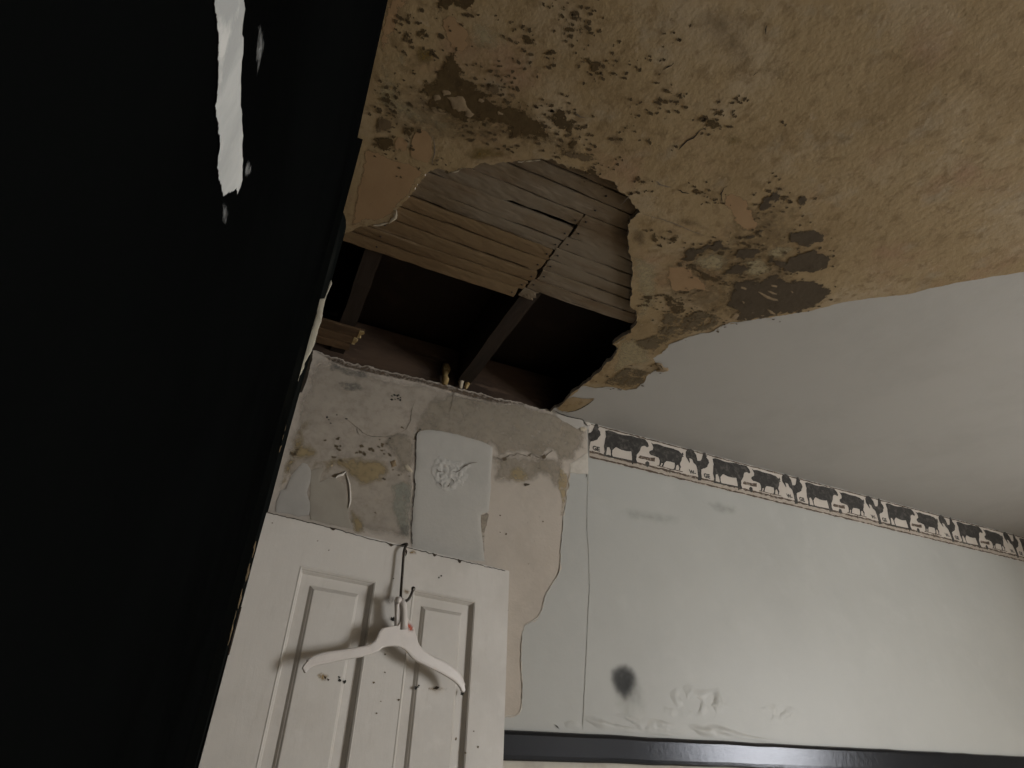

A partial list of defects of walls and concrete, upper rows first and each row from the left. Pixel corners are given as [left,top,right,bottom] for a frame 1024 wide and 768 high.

peeling [268,0,1024,718]